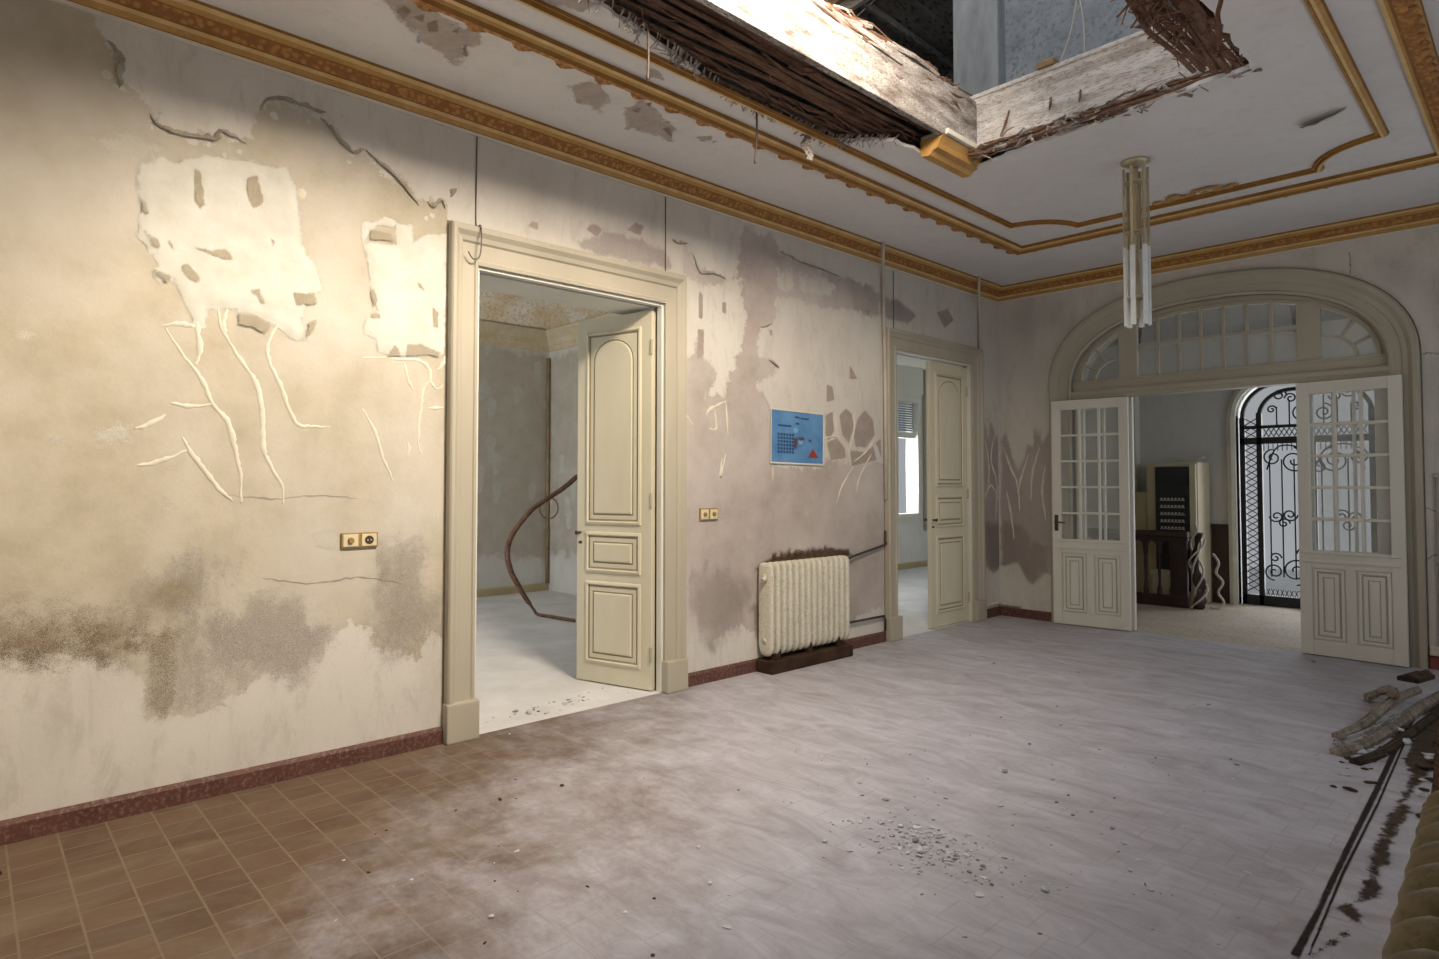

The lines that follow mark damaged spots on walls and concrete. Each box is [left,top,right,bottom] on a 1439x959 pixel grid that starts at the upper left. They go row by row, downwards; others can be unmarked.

peeling [383,0,482,67]
peeling [567,81,676,142]
crack [231,493,357,501]
peeling [577,223,916,648]
damp [984,422,1051,587]
damp [0,527,443,727]